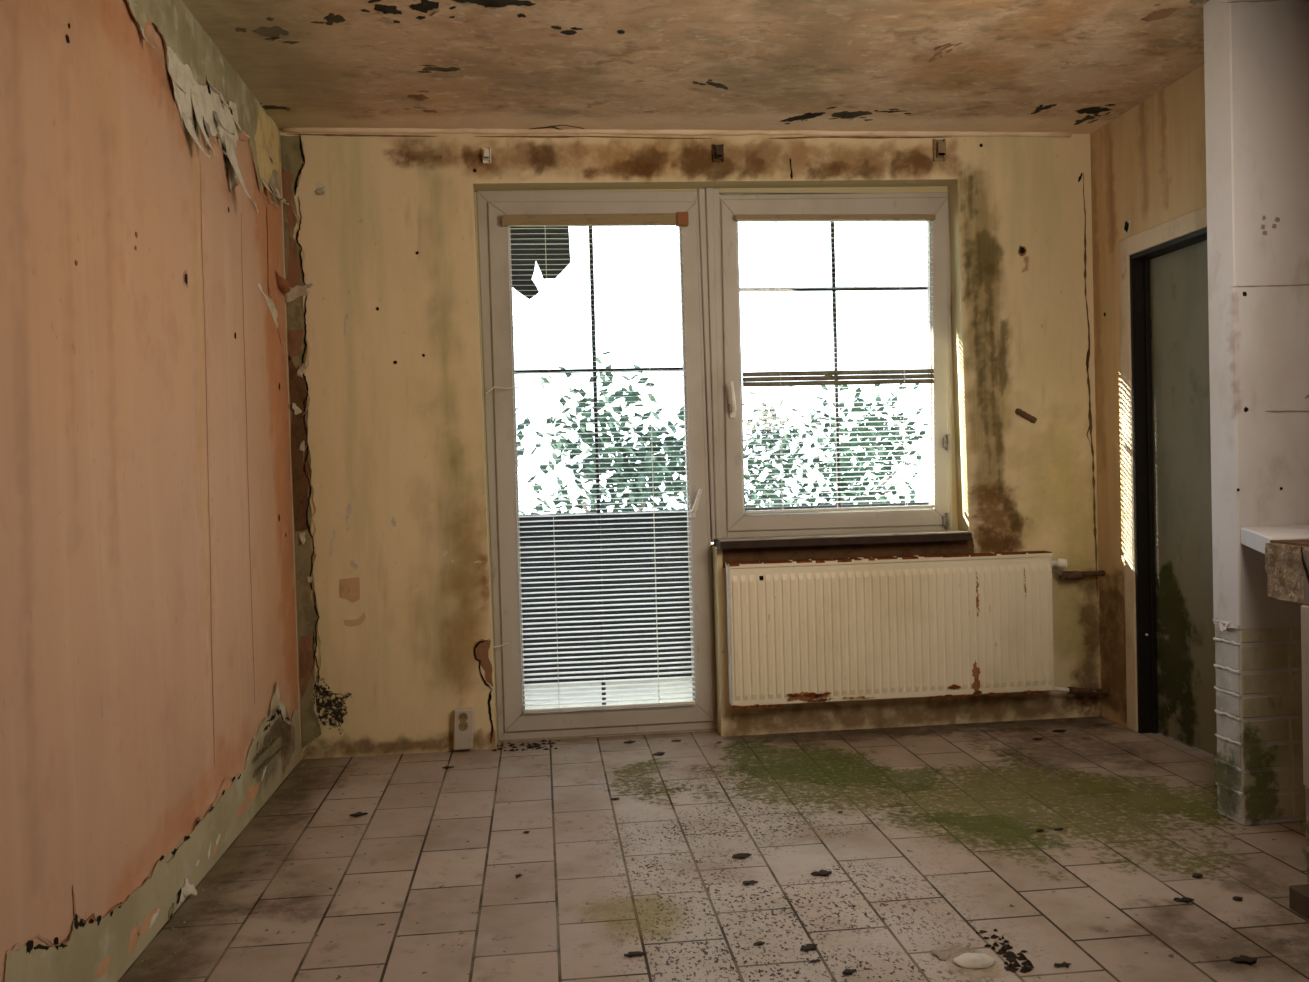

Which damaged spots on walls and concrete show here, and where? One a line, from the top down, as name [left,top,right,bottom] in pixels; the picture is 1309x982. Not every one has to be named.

peeling [310,13,346,25]
peeling [361,0,535,23]
peeling [551,26,584,35]
peeling [779,107,911,124]
peeling [1074,104,1115,125]
water stain [894,154,932,171]
water stain [966,178,1023,552]
crack [1083,175,1098,596]
crack [266,134,438,699]
peeling [3,0,321,982]
spalling [474,639,493,690]
water stain [732,582,1127,736]